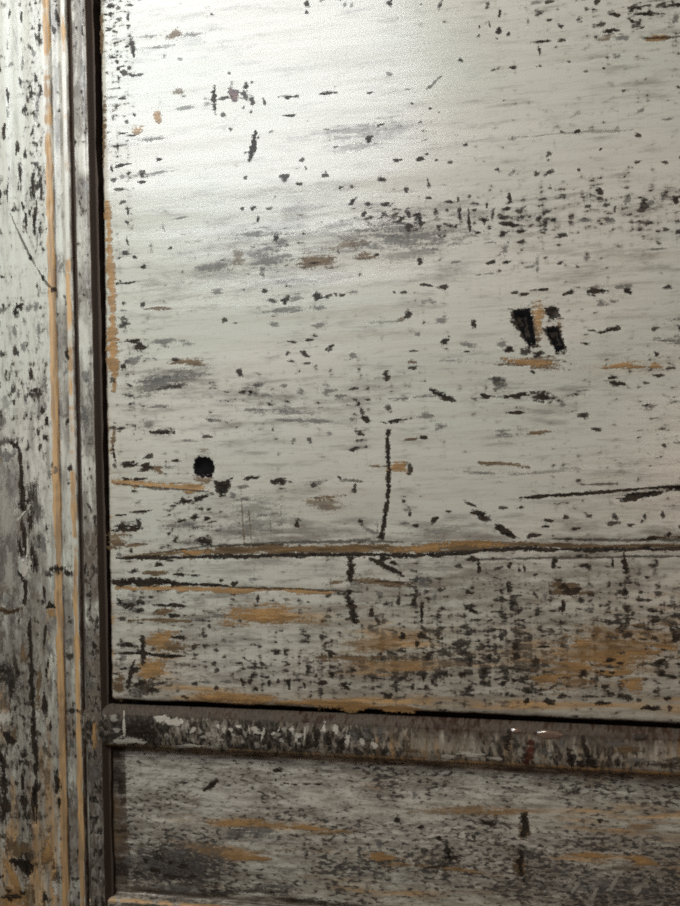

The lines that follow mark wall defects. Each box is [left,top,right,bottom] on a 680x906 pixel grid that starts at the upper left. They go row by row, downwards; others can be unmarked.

spalling [597,3,680,41]
spalling [436,193,541,243]
spalling [497,288,570,374]
spalling [586,285,632,306]
spalling [10,368,48,458]
spalling [381,389,456,424]
peeling [36,564,73,717]
peeling [111,594,310,702]
peeling [181,634,430,713]
peeling [523,552,680,711]
spalling [216,721,383,751]
spalling [512,807,531,882]